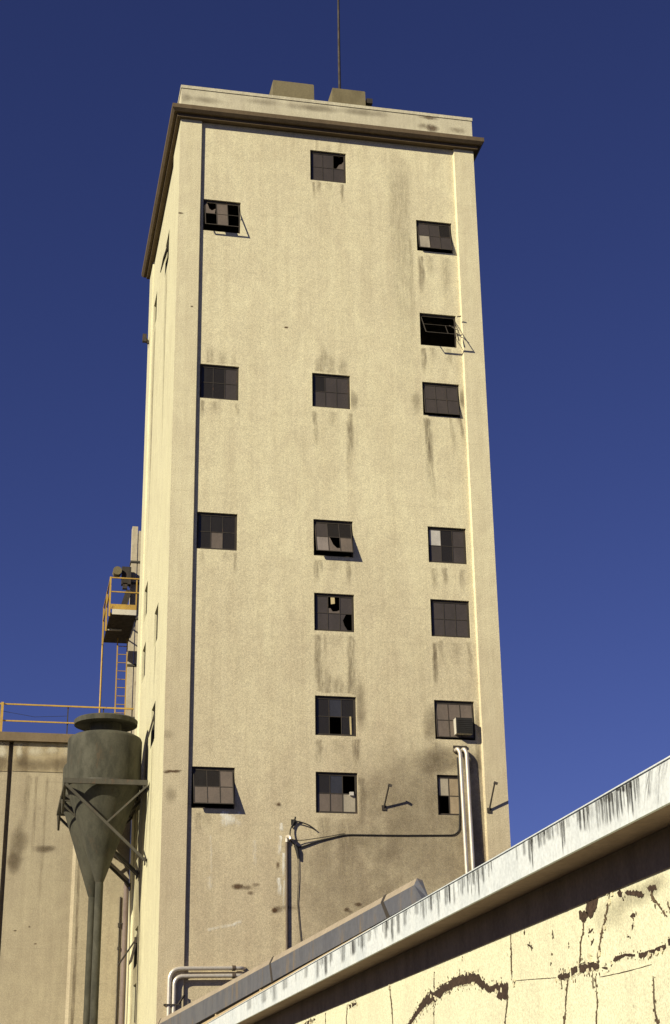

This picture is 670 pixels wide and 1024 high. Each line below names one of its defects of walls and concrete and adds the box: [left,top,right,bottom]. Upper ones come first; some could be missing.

damp [579,768,660,828]
crack [650,892,670,917]
crack [504,892,660,1024]
crack [386,984,394,1024]